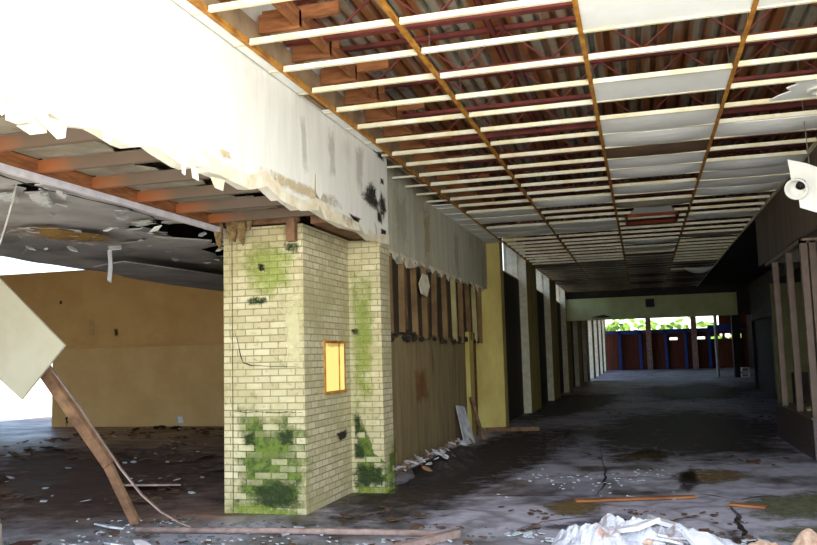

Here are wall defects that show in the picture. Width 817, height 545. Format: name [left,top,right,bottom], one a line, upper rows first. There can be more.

flaking render [0,71,483,297]
water stain [362,178,386,224]
crack [574,448,607,495]